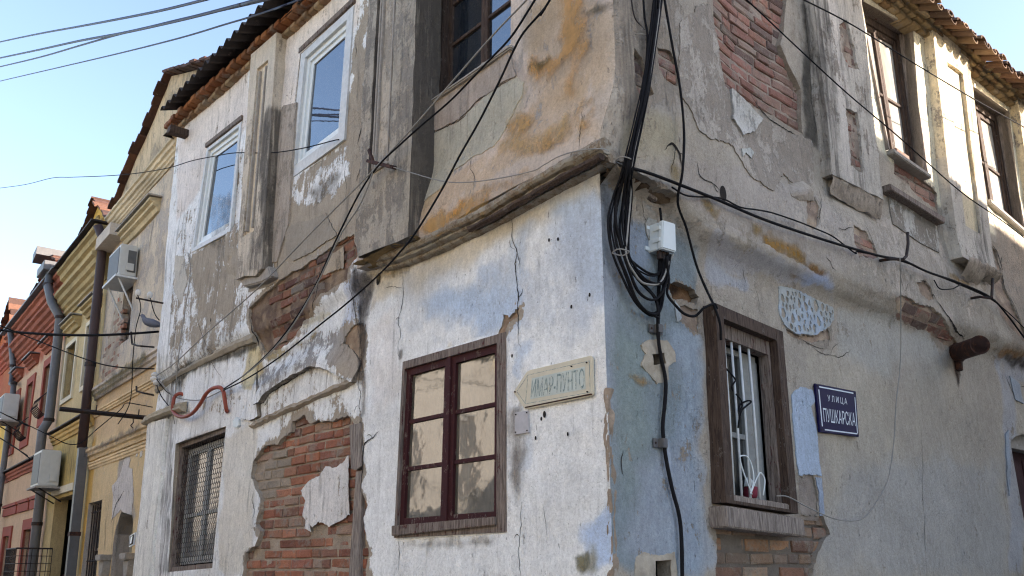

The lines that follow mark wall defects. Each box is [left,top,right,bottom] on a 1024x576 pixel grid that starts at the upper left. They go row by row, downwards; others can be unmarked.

leakage [530,0,599,77]
flaking render [657,0,814,191]
spalling [846,110,861,172]
flaking render [251,213,357,352]
crack [509,223,523,342]
spalling [640,339,676,384]
flaking render [669,284,697,332]
flaking render [895,281,954,347]
flaking render [246,417,369,576]
flaking render [716,387,827,576]